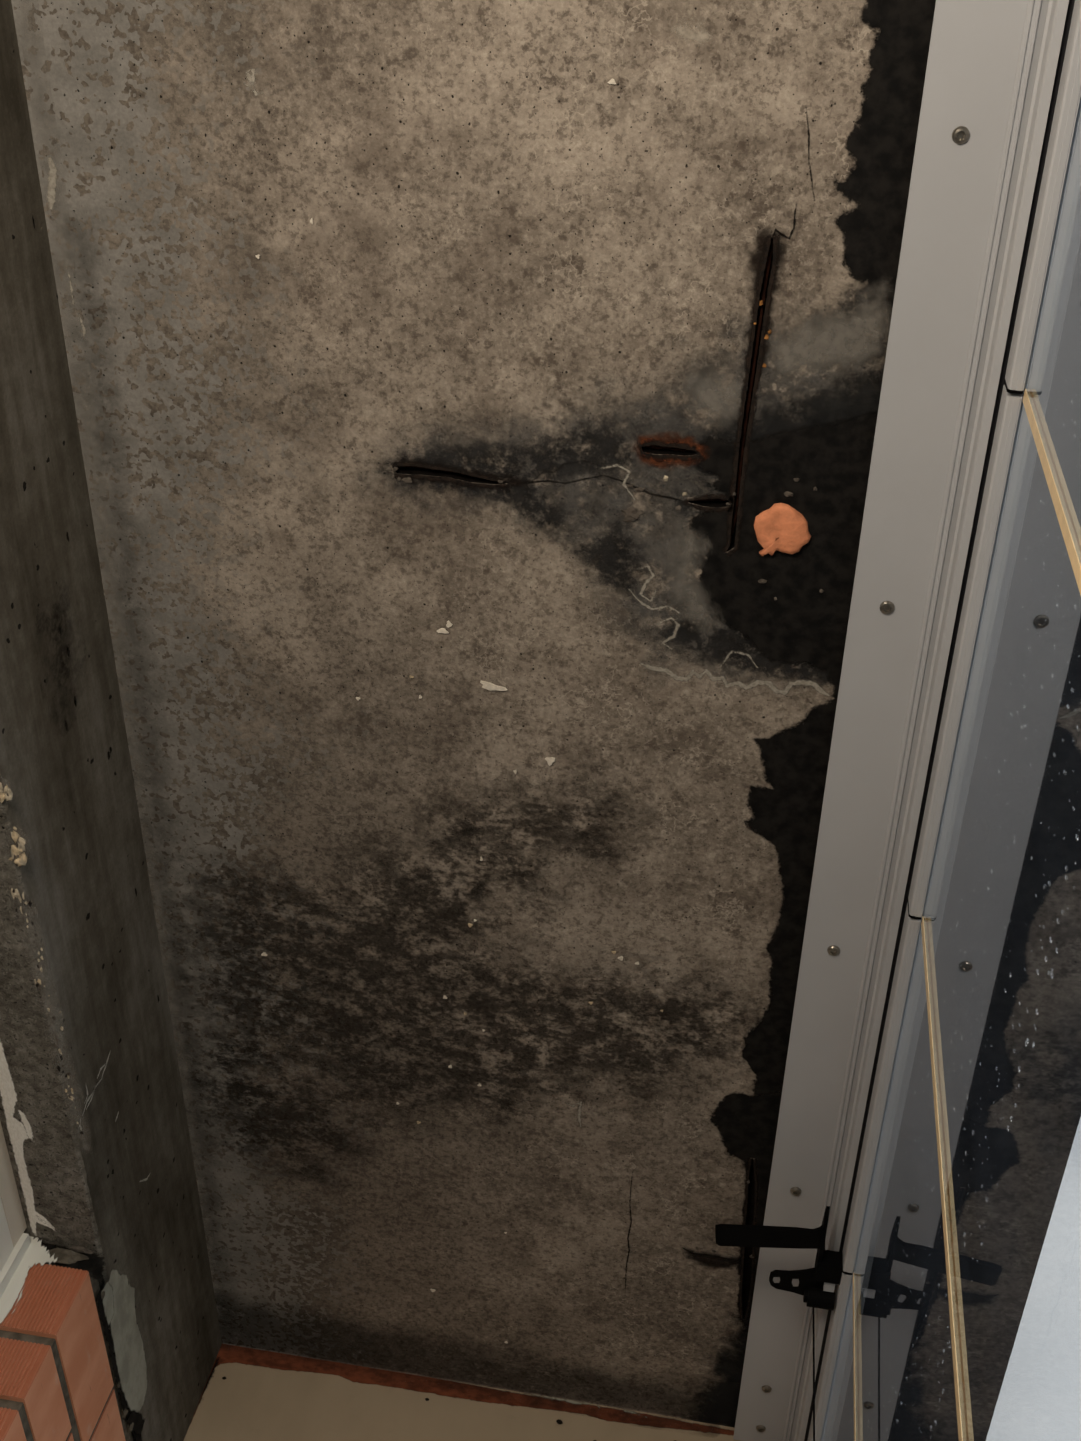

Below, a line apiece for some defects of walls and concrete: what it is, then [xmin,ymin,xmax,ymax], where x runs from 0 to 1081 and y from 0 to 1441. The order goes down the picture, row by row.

water stain [47,158,58,210]
water stain [182,0,936,1225]
water stain [682,1247,760,1428]